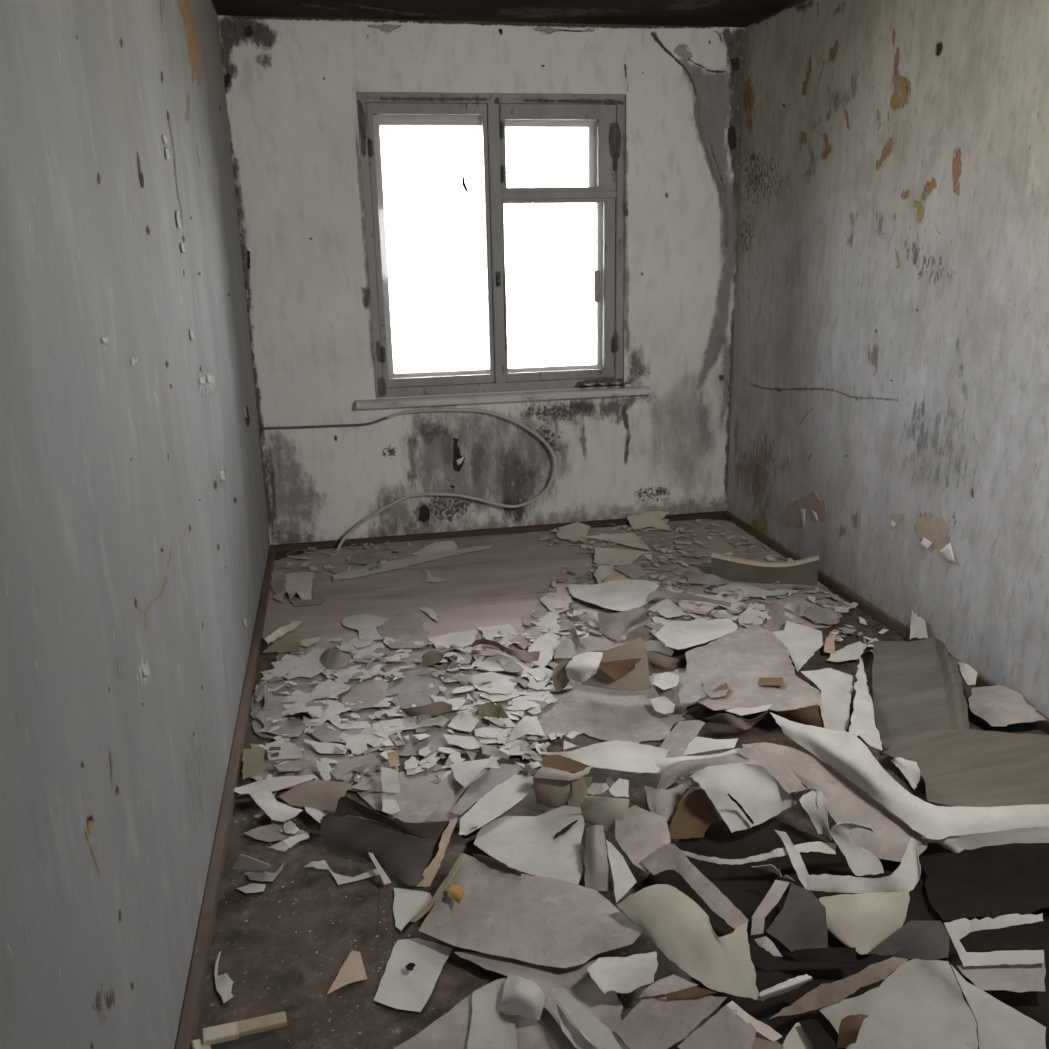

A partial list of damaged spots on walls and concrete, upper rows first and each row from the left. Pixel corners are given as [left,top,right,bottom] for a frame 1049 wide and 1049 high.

damp [218,16,276,92]
peeling [802,40,839,95]
peeling [799,77,856,182]
peeling [876,29,911,170]
peeling [901,178,936,222]
peeling [952,148,962,195]
damp [362,261,370,308]
damp [624,137,645,382]
damp [228,120,314,544]
crack [749,382,898,422]
damp [370,395,647,537]
peeling [890,513,956,563]